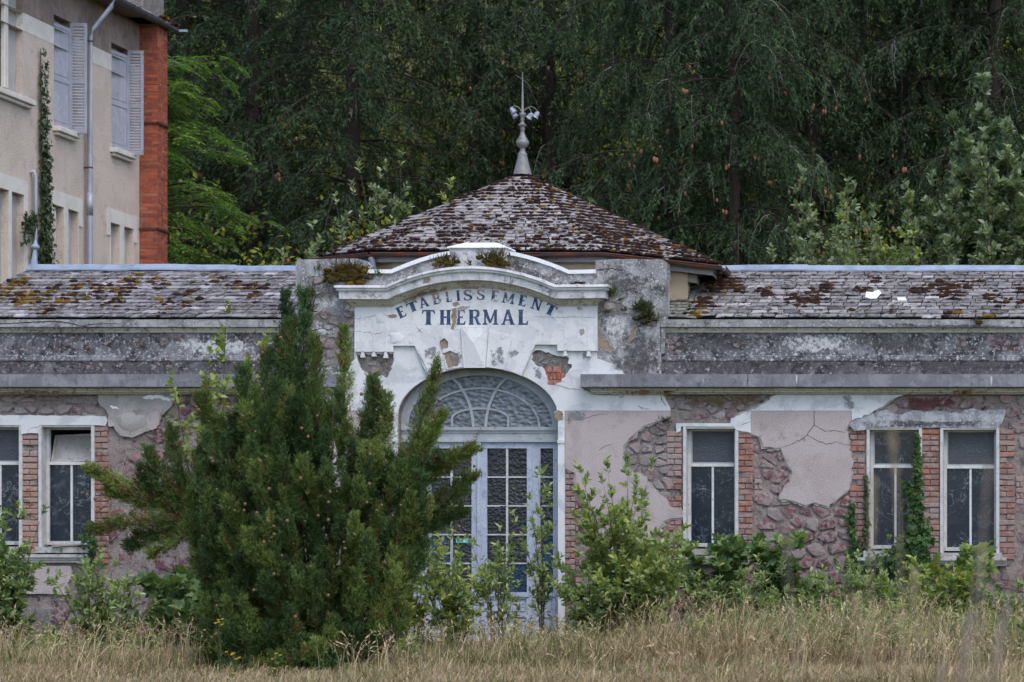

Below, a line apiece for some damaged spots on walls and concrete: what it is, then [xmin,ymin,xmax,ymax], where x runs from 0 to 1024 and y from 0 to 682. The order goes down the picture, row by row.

water stain [176,338,249,355]
flaking render [440,301,469,368]
flaking render [532,350,572,385]
water stain [675,336,783,381]
water stain [782,323,1008,353]
flaking render [122,395,238,478]
flaking render [0,395,162,566]
flaking render [565,470,599,615]
flaking render [624,395,766,562]
flaking render [738,429,865,607]